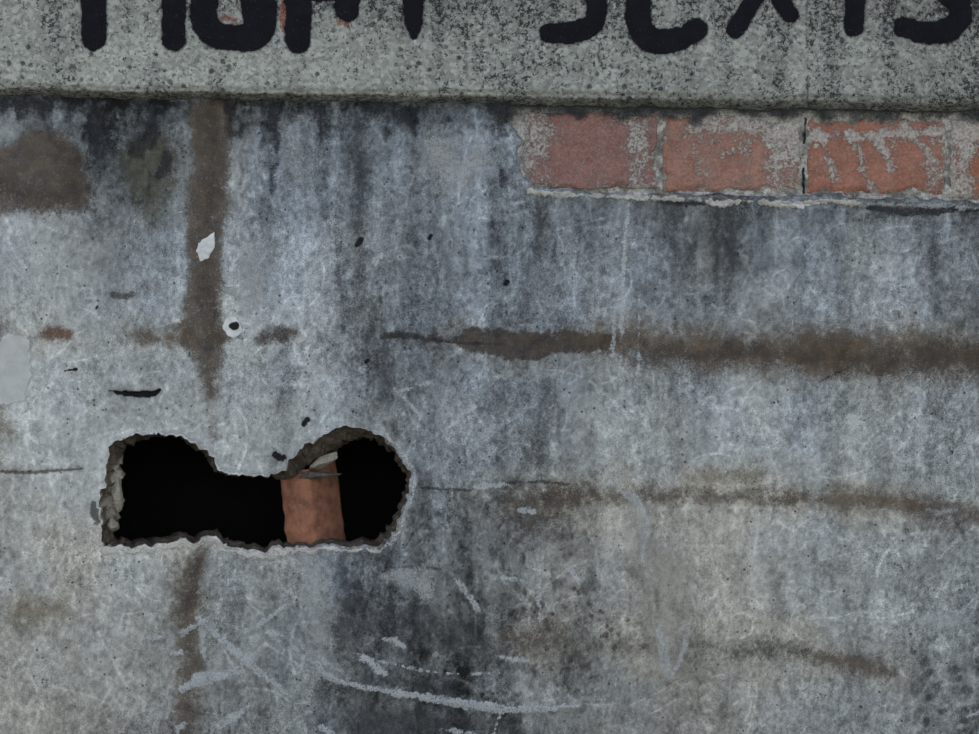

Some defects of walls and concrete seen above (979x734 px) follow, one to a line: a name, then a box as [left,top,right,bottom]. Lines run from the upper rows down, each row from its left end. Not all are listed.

water stain [128,98,160,159]
water stain [244,101,331,195]
water stain [332,101,417,312]
water stain [532,201,549,256]
spalling [490,100,979,217]
water stain [358,317,431,421]
water stain [609,192,630,479]
rust [380,316,979,389]
spalling [90,425,417,559]
water stain [473,481,509,490]
water stain [302,551,581,734]